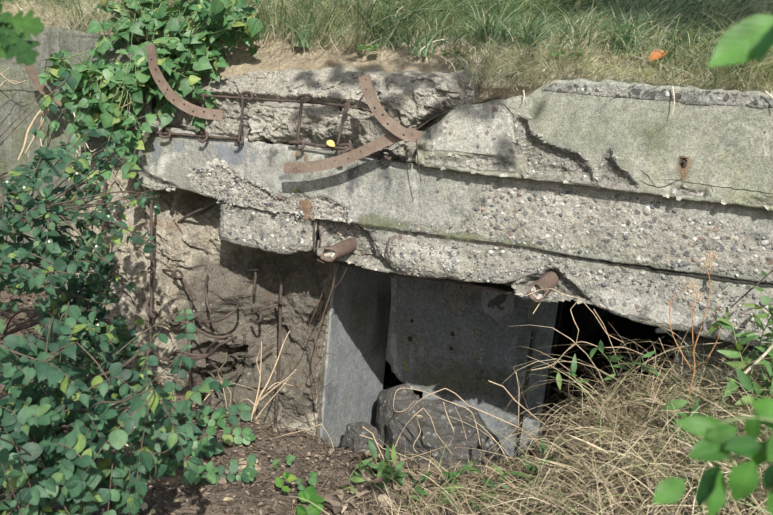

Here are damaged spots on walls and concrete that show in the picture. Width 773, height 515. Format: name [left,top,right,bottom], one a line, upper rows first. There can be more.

spalling [134,84,393,161]
spalling [177,105,773,339]
crack [642,171,773,203]